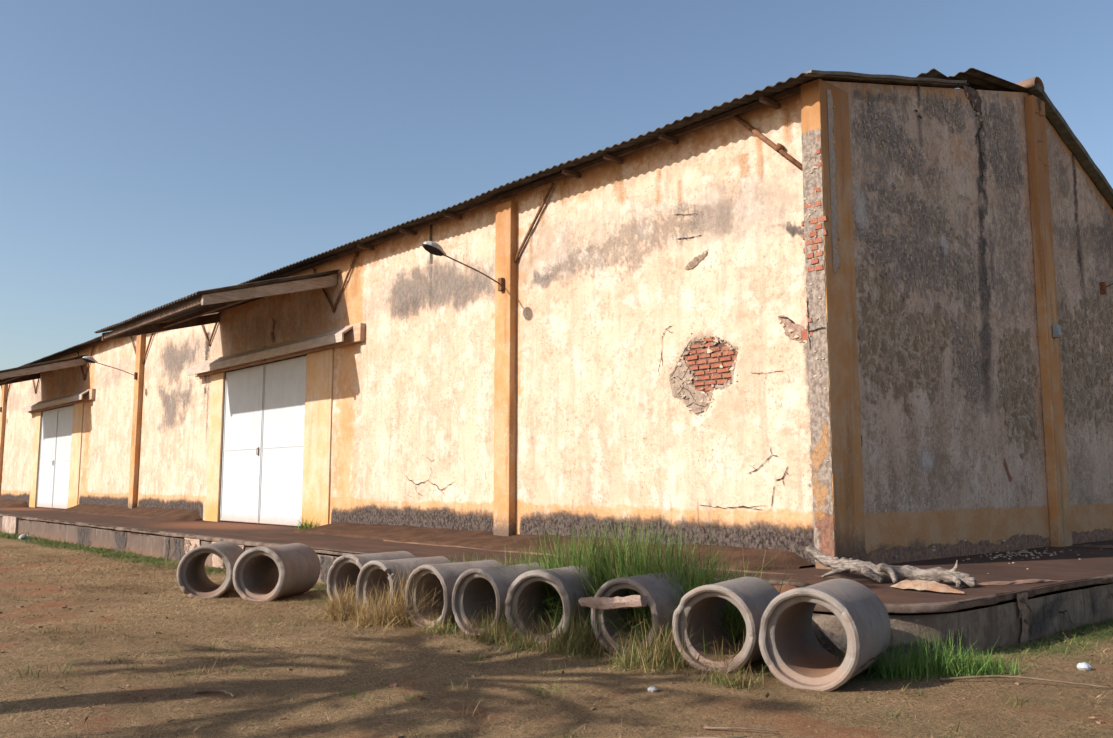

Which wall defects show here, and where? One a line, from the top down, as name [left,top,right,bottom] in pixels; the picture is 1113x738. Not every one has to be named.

peeling [921,85,983,133]
spalling [669,333,739,419]
spalling [778,89,841,563]
peeling [855,268,952,420]
damp [976,113,994,411]
peeling [1058,292,1113,434]
mould [331,505,494,532]
damp [519,502,816,567]